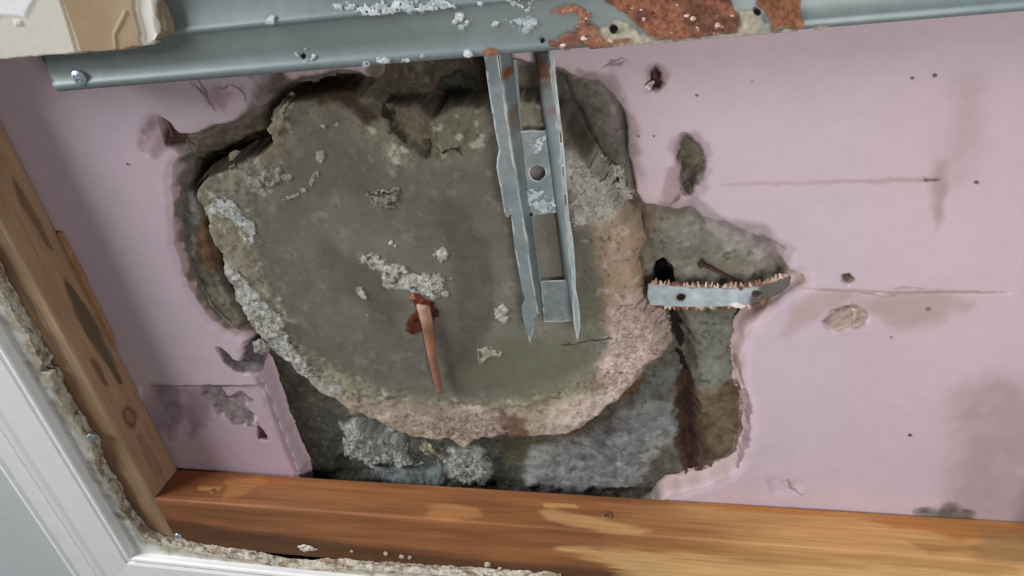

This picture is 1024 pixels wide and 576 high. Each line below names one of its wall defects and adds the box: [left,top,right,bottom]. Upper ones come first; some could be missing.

corrosion [549,5,630,51]
corrosion [605,0,740,41]
corrosion [756,0,804,31]
spalling [387,91,440,158]
spalling [663,136,705,205]
peeling [366,187,400,210]
corrosion [405,293,439,335]
corrosion [674,368,716,474]